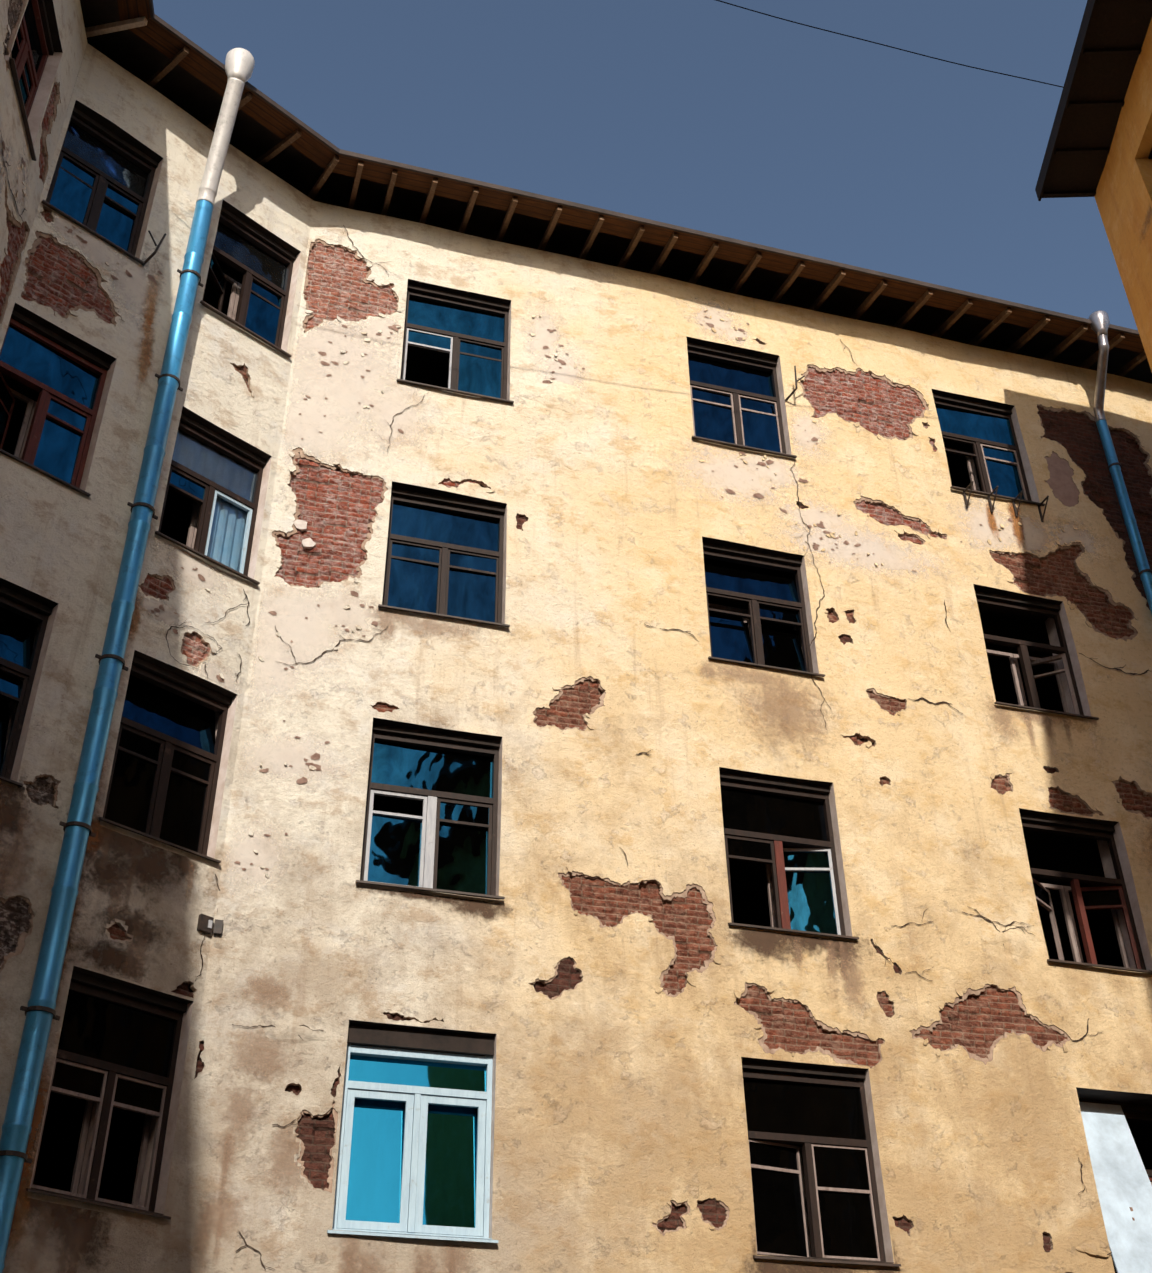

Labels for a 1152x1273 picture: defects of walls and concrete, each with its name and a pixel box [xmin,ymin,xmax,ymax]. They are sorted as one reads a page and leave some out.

flaking render [793,364,937,452]
flaking render [254,239,418,696]
flaking render [780,404,1152,645]
crack [166,589,388,682]
crack [791,459,831,730]
flaking render [533,676,606,731]
leakage [73,818,197,978]
flaking render [558,864,721,998]
crack [963,907,1035,945]
flaking render [734,982,885,1068]
flaking render [909,984,1071,1065]
leakage [750,1248,897,1273]